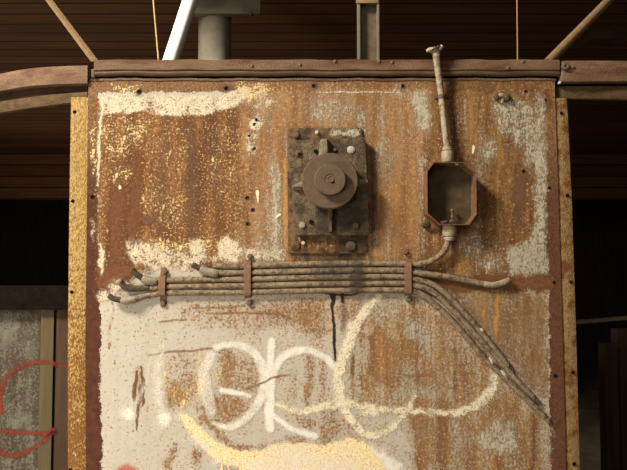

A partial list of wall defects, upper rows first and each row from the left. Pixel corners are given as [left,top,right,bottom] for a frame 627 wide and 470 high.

peeling [89,81,278,187]
peeling [91,223,106,275]
rust [91,81,556,470]
peeling [370,298,425,345]
peeling [472,414,520,456]